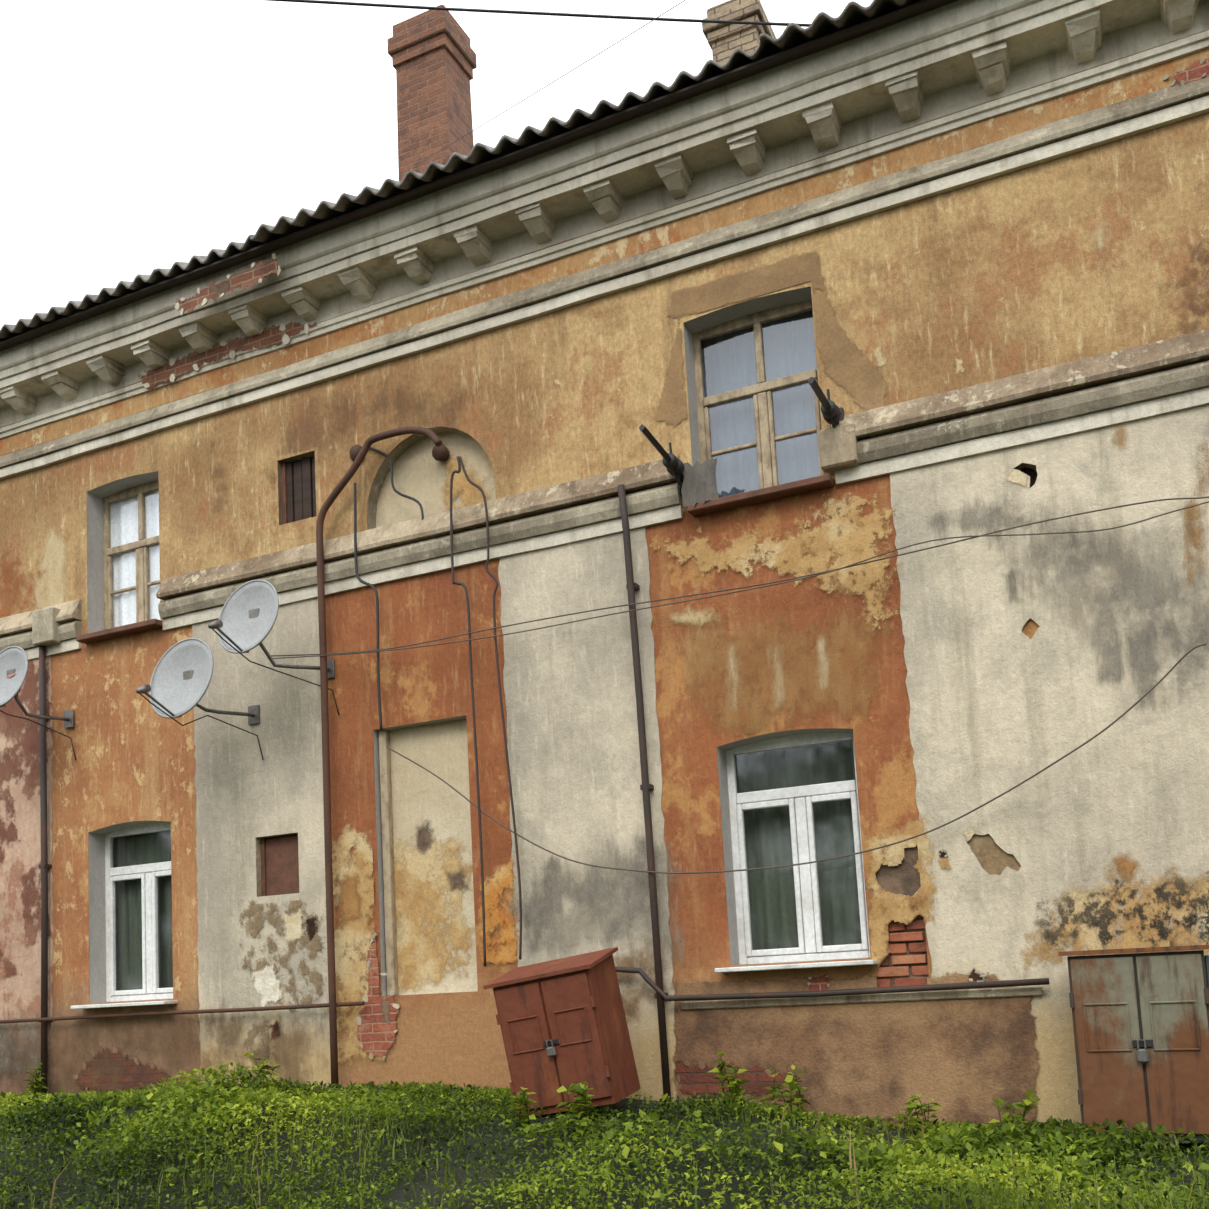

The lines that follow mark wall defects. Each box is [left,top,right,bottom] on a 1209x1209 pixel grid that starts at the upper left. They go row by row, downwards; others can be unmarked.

leakage [1176,241,1209,332]
flaking render [139,322,317,390]
peeling [650,492,901,629]
leakage [961,503,1029,537]
leakage [1008,571,1016,599]
spalling [1007,463,1038,489]
leakage [1031,527,1209,706]
peeling [0,659,54,863]
peeling [238,824,519,1066]
peeling [866,816,952,987]
flaking render [963,829,1021,876]
peeling [1022,856,1209,969]